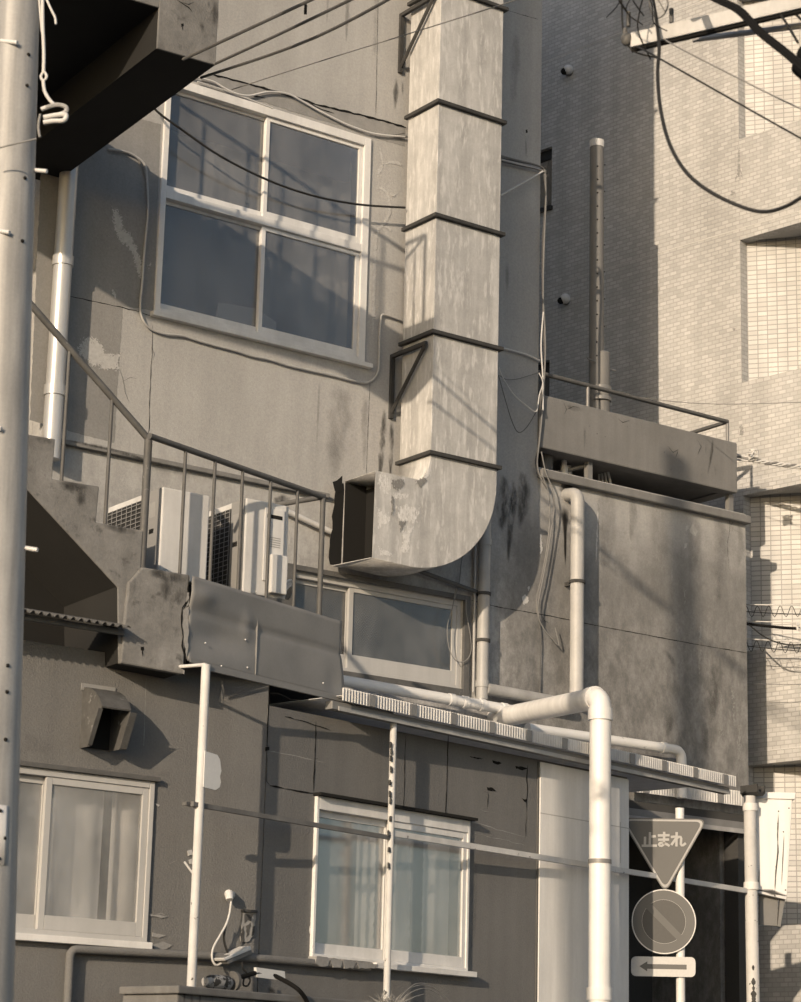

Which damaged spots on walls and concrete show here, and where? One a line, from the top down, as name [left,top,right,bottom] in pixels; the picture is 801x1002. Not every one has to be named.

peeling [112,207,152,278]
peeling [376,466,430,557]
crack [181,577,190,664]